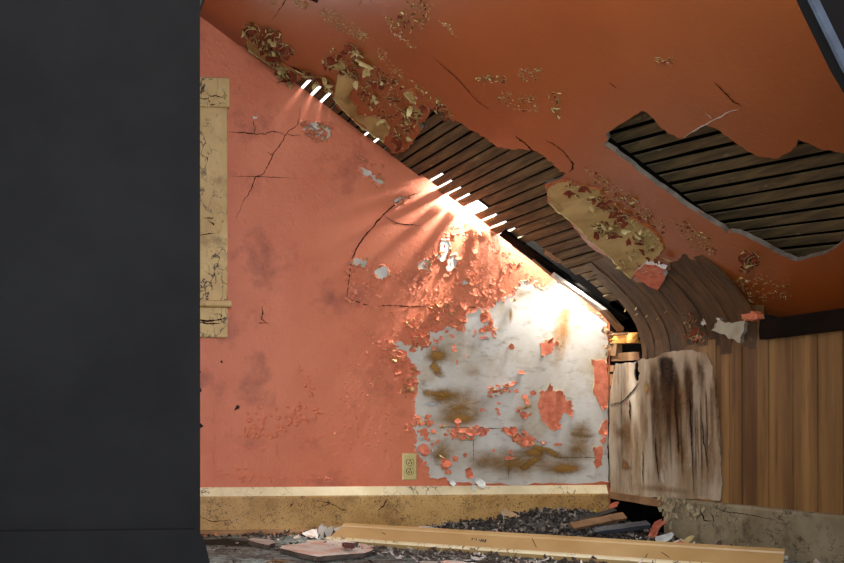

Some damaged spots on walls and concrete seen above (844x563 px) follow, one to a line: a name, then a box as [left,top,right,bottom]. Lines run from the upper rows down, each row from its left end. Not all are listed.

crack [233,110,300,218]
peeling [241,0,718,491]
crack [685,82,741,137]
spalling [610,111,844,257]
water stain [484,445,579,474]
water stain [608,350,724,501]